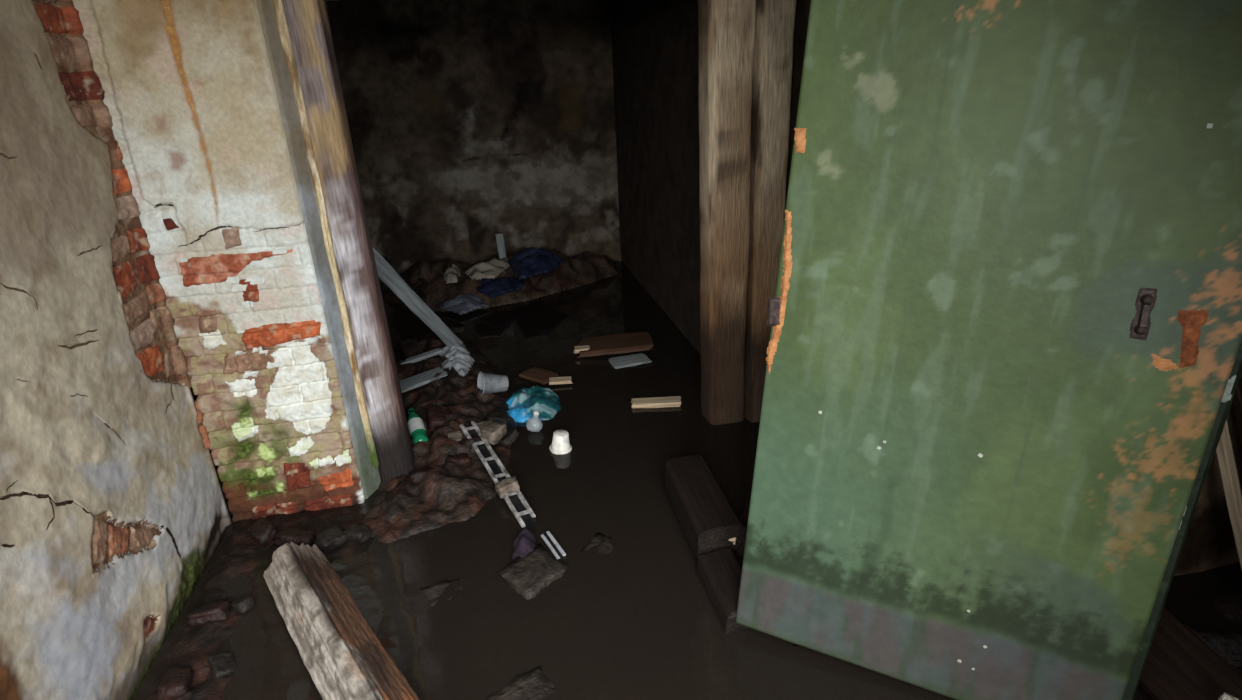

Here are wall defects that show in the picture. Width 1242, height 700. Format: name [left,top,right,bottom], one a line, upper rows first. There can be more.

rust [161,0,217,205]
flaking render [32,0,211,450]
peeling [179,227,293,308]
crack [178,223,301,247]
peeling [196,309,354,519]
crack [0,480,94,531]
flaking render [91,507,162,580]